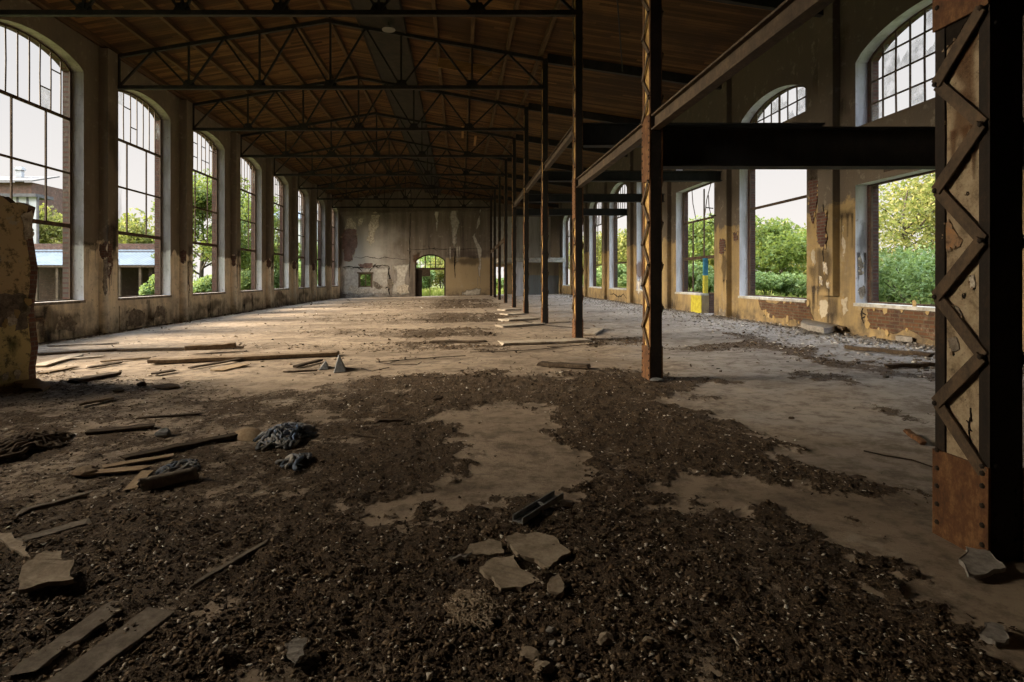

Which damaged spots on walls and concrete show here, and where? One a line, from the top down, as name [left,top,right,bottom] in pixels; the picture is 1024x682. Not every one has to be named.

flaking render [99,239,113,296]
spalling [340,212,380,268]
spalling [348,279,409,294]
spalling [758,179,963,356]